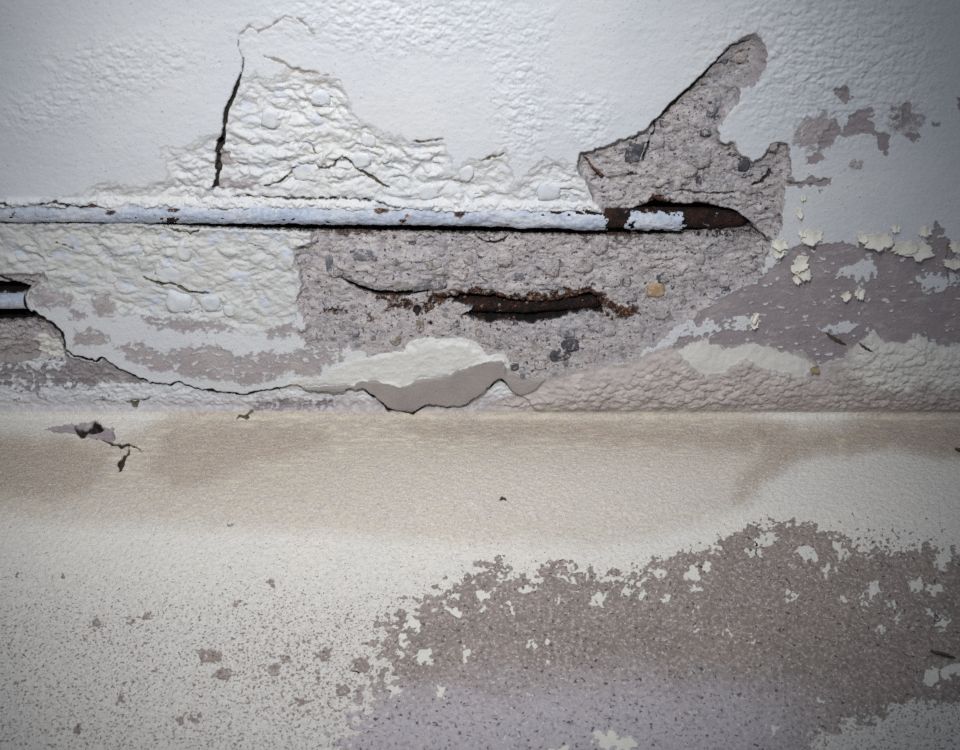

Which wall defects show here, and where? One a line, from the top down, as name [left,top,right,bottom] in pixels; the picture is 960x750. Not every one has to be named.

crack [212,15,432,211]
crack [0,200,103,208]
spalling [0,33,960,401]
crack [143,276,209,294]
corrosion [366,292,413,322]
crack [33,310,301,420]
peeling [254,395,334,411]
crack [346,389,430,415]
crack [96,439,141,472]
water stain [0,411,960,517]
peeling [186,517,960,750]
peeling [175,713,202,725]